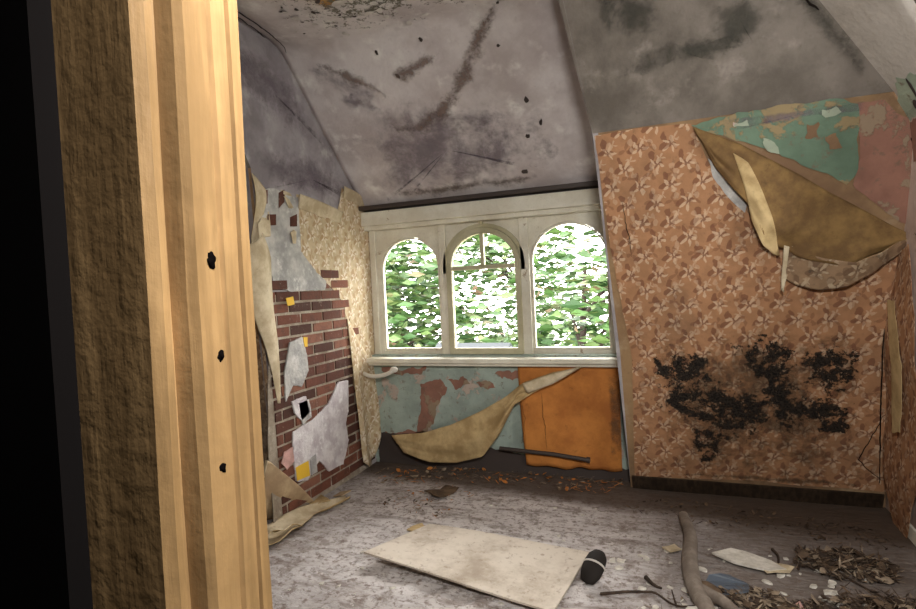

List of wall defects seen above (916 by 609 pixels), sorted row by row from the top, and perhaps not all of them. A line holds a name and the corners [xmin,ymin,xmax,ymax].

leakage [324,66,380,92]
leakage [386,10,508,193]
peeling [691,73,916,224]
flaking render [258,188,375,523]
peeling [382,366,518,434]
leakage [653,334,859,462]